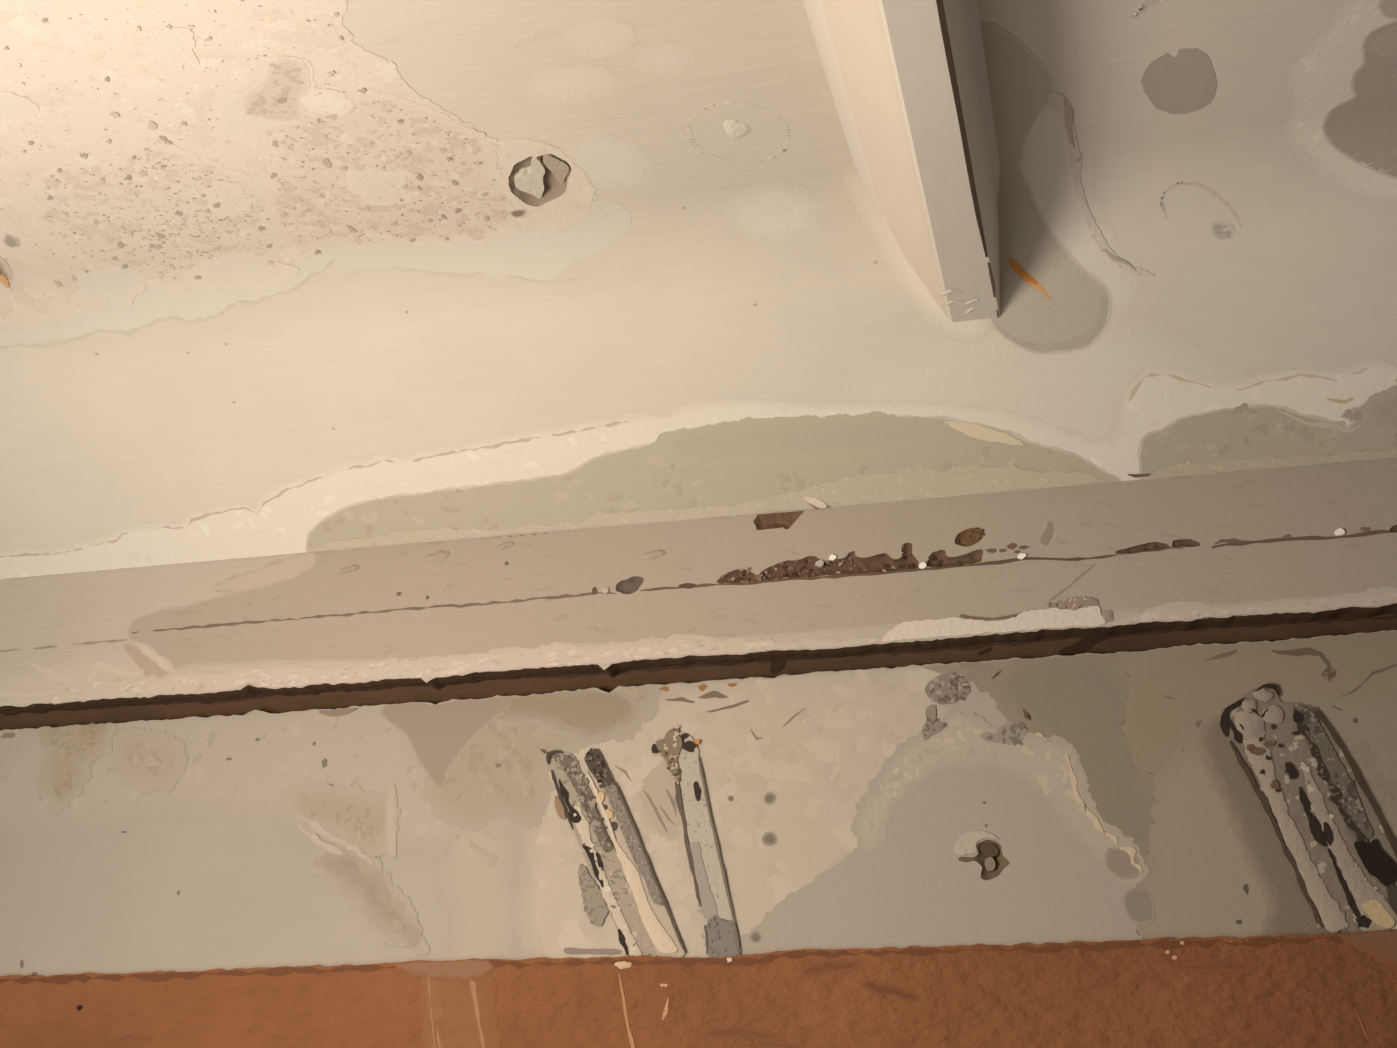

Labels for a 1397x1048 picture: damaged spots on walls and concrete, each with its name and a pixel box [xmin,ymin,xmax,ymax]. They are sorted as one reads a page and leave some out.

peeling [0,0,597,333]
rust [1006,257,1052,301]
leakage [0,0,1397,706]
spalling [680,733,696,752]
peeling [1246,741,1275,756]